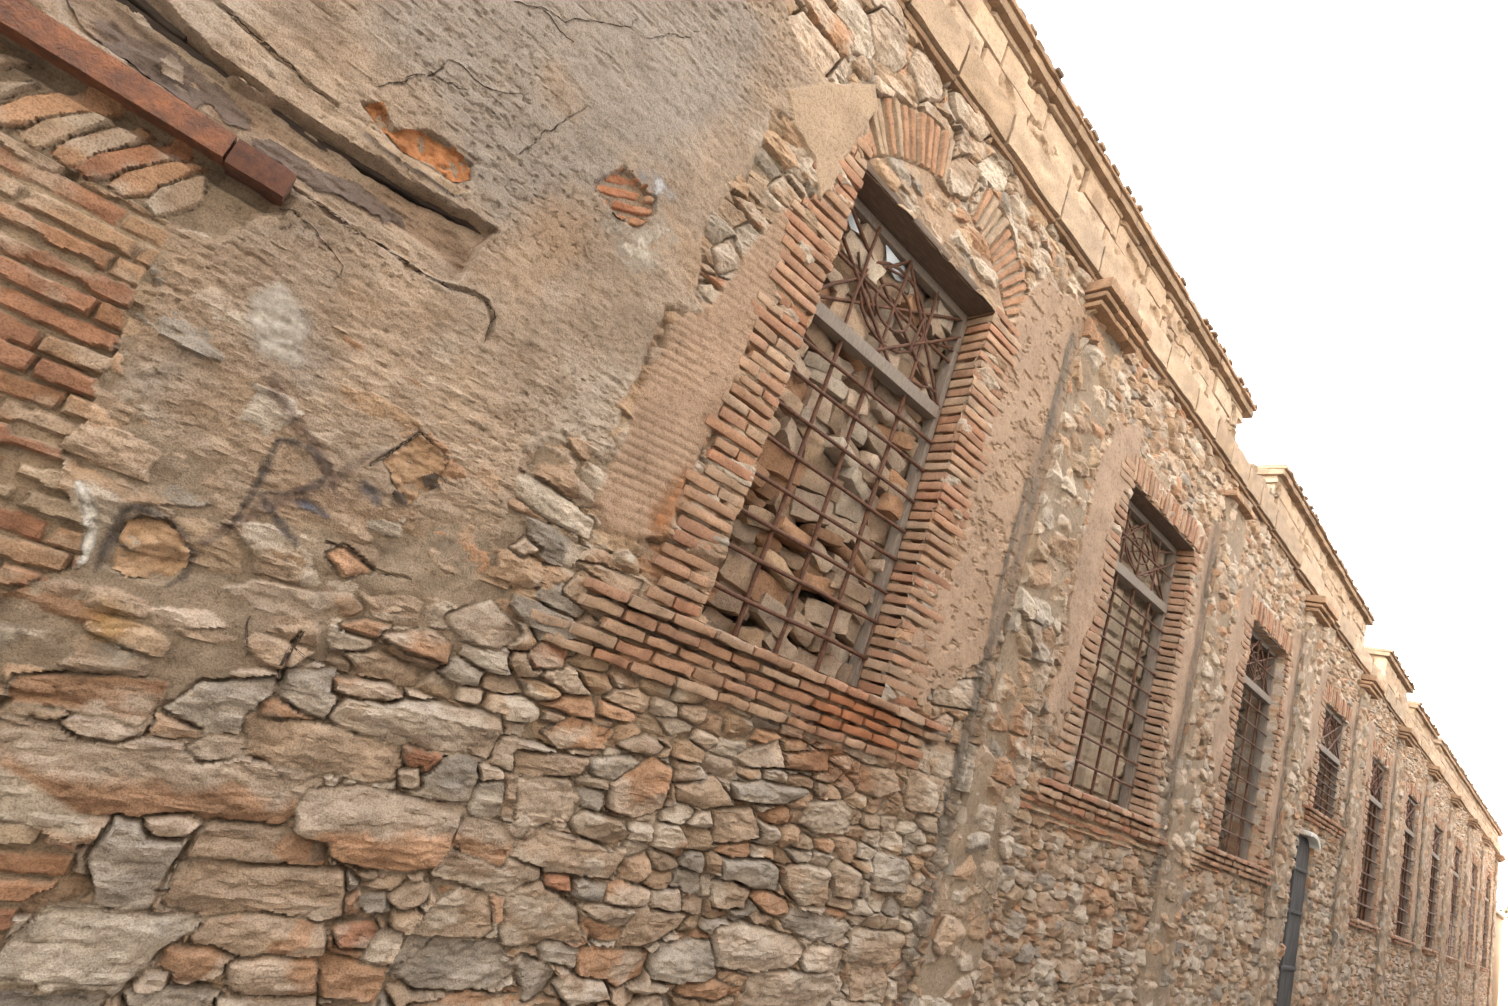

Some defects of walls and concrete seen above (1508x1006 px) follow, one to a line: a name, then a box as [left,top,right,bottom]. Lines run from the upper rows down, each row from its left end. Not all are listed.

crack [514,1,700,42]
peeling [67,0,406,228]
flaking render [363,101,471,195]
crack [378,59,523,95]
crack [279,191,496,340]
flaking render [597,167,674,270]
flaking render [384,435,447,505]
flaking render [112,517,190,578]